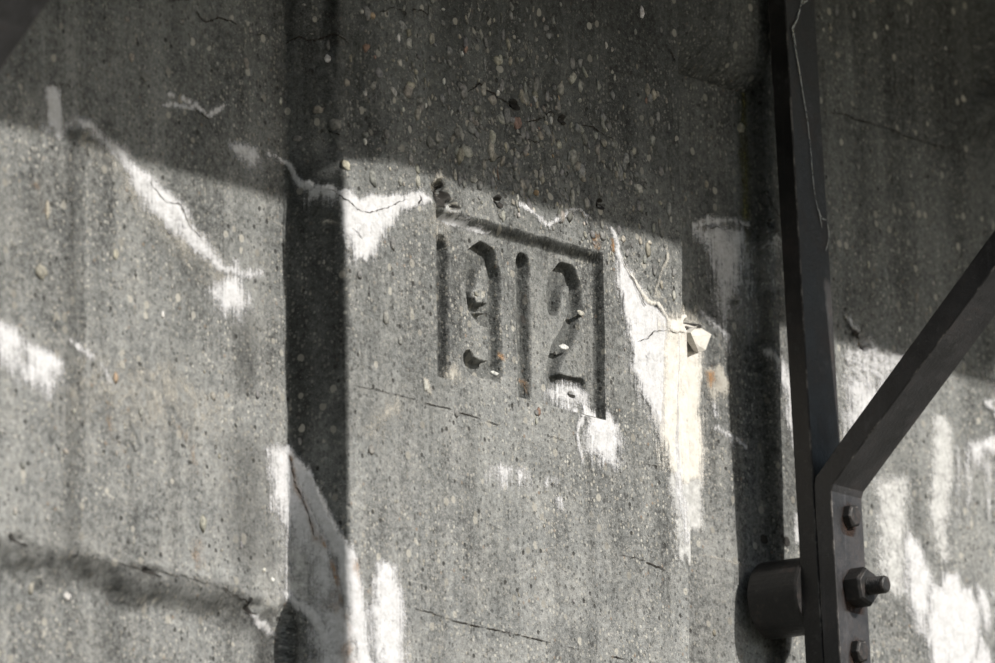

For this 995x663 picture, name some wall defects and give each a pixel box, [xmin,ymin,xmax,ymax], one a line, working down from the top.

efflorescence [0,321,65,400]
efflorescence [41,83,264,320]
efflorescence [230,142,432,262]
efflorescence [435,213,491,234]
damp [611,93,780,565]
efflorescence [842,317,903,435]
damp [266,444,409,663]
efflorescence [875,415,995,663]